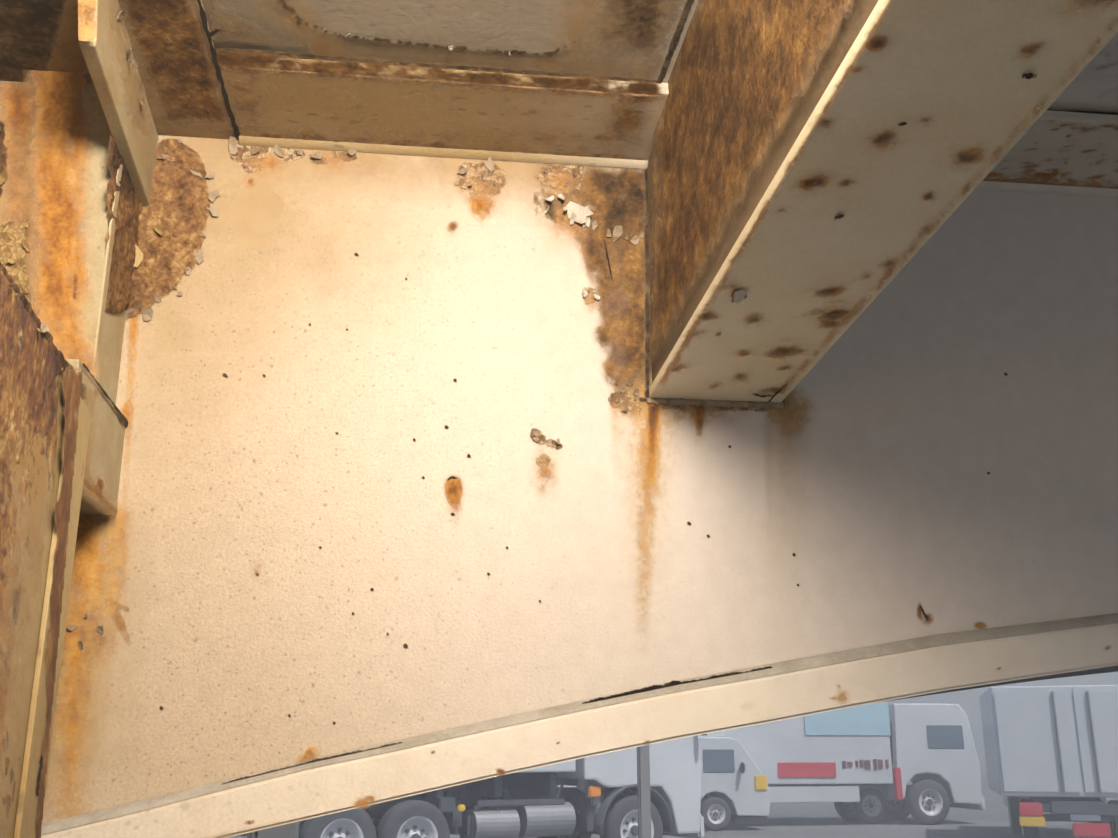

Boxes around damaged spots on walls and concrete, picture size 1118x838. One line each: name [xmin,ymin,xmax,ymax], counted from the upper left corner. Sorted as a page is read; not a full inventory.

water stain [535,0,684,78]
corrosion [867,25,887,51]
corrosion [1020,45,1041,56]
corrosion [872,131,895,148]
corrosion [957,124,1118,195]
peeling [534,164,595,230]
corrosion [105,133,220,440]
corrosion [123,0,865,579]
peeling [582,287,601,305]
peeling [530,428,563,478]
corrosion [298,746,317,761]
corrosion [356,796,374,806]